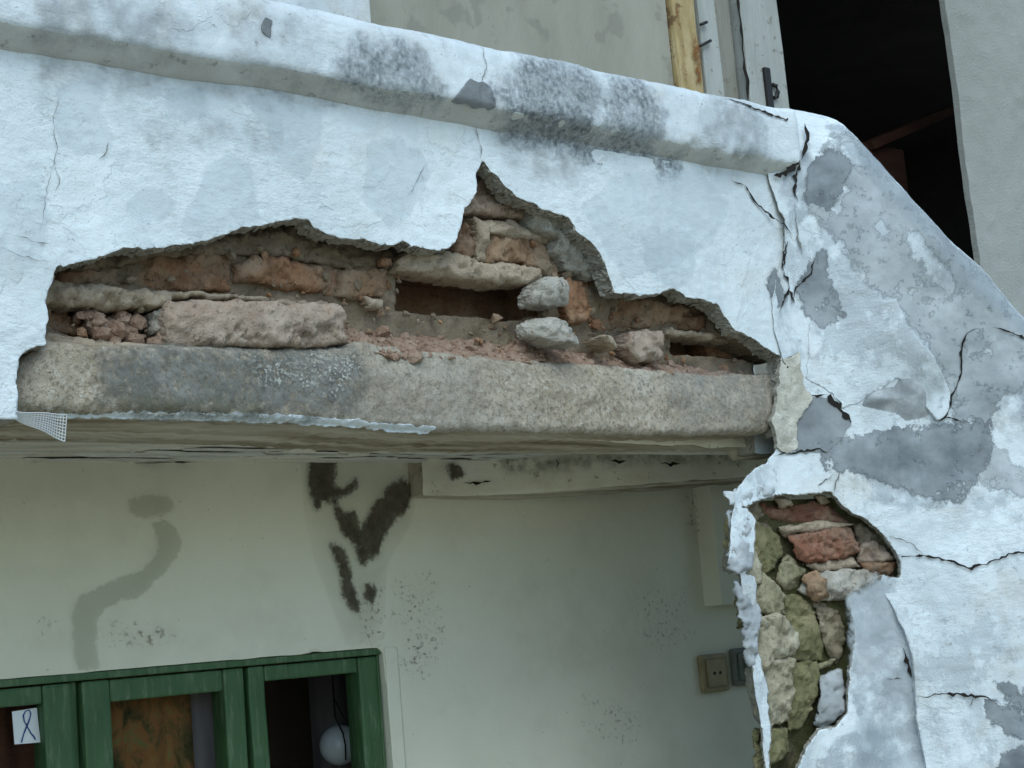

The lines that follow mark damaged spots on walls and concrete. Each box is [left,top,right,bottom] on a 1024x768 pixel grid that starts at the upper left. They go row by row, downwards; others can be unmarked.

peeling [451,79,496,110]
crack [728,0,815,312]
flaking render [0,126,1024,507]
crack [934,327,1024,421]
damp [334,479,365,566]
crack [894,537,1024,570]
flaking render [736,495,1024,768]